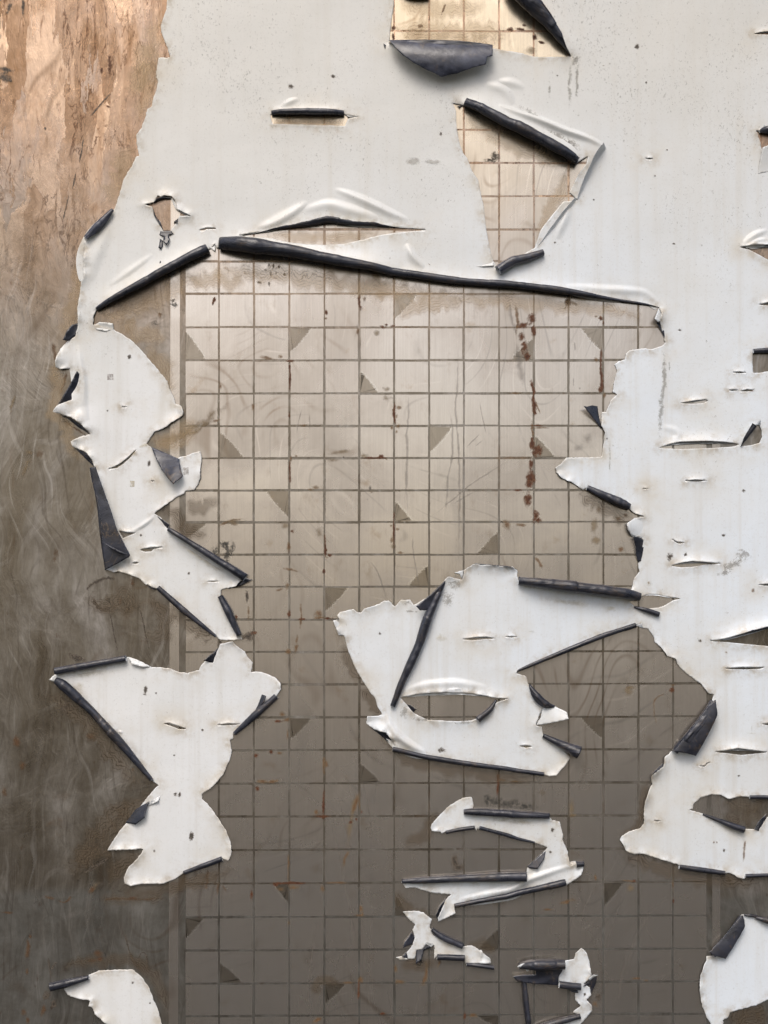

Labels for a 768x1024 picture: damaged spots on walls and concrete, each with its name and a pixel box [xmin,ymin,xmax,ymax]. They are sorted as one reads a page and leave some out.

peeling [515,0,571,56]
peeling [96,98,665,338]
corrosion [516,309,536,361]
peeling [75,448,130,570]
corrosion [501,382,546,527]
peeling [586,485,644,562]
peeling [49,517,281,886]
peeling [390,565,497,722]
peeling [475,531,672,672]
peeling [395,797,584,970]
peeling [49,969,162,1024]
peeling [513,948,597,1024]